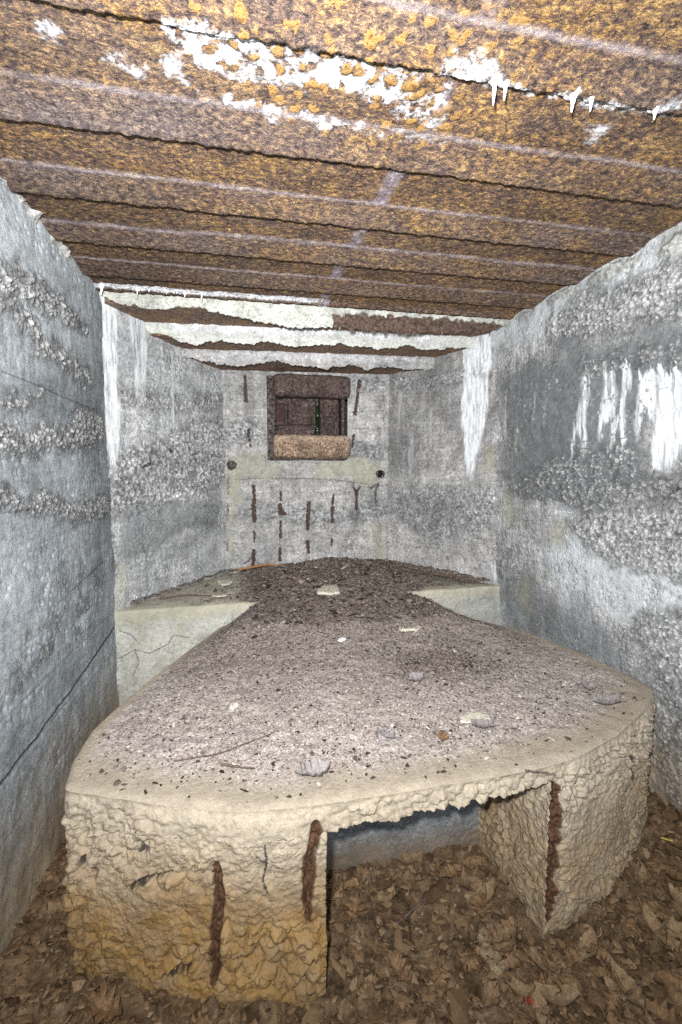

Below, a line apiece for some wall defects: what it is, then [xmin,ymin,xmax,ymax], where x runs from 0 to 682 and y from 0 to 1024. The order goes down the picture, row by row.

leakage [160,19,565,131]
leakage [581,101,646,113]
leakage [159,323,492,482]
corrosion [353,380,362,416]
leakage [501,300,682,503]